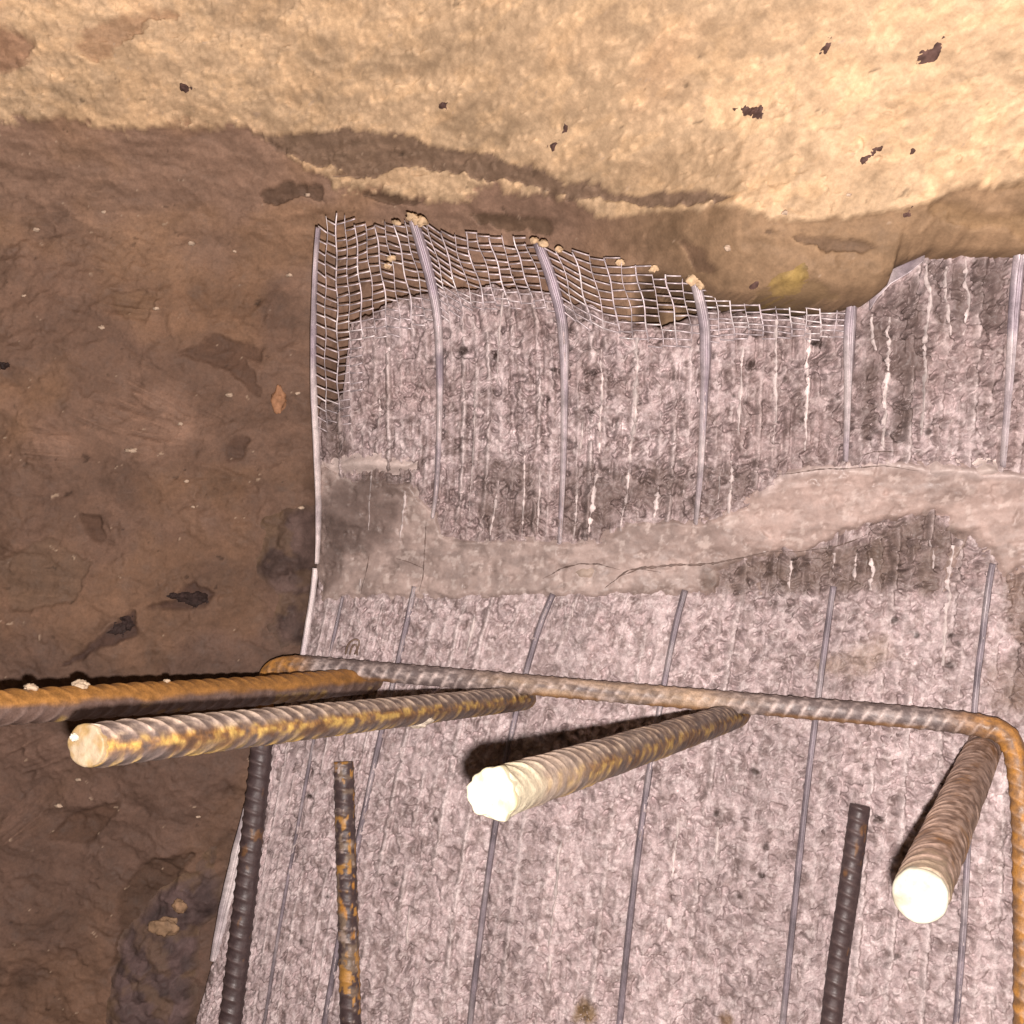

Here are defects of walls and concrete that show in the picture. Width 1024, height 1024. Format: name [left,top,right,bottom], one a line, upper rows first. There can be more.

leakage [737,348,745,435]
leakage [804,330,812,450]
leakage [862,256,1001,448]
leakage [620,337,640,531]
leakage [521,456,541,538]
leakage [573,474,600,540]
leakage [653,486,661,518]
leakage [717,461,735,513]
rust [575,1002,596,1022]